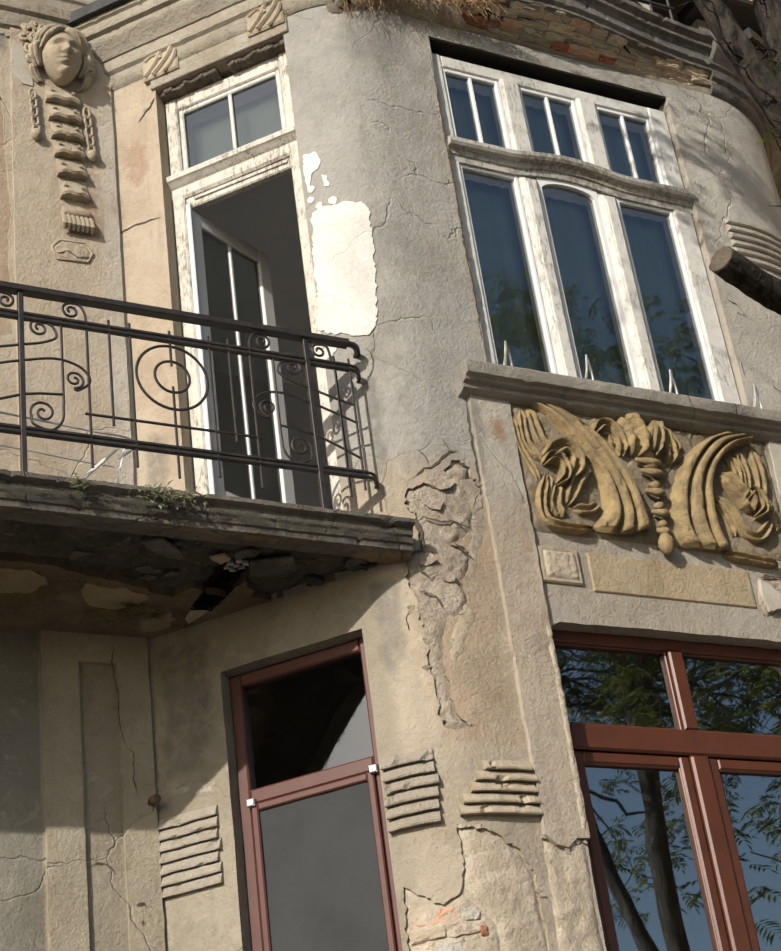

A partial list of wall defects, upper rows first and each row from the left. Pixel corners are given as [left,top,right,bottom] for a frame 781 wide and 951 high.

flaking render [460,0,716,88]
spalling [0,520,378,632]
flaking render [405,461,486,729]
flaking render [756,574,781,616]
crack [111,648,137,793]
flaking render [405,626,604,951]